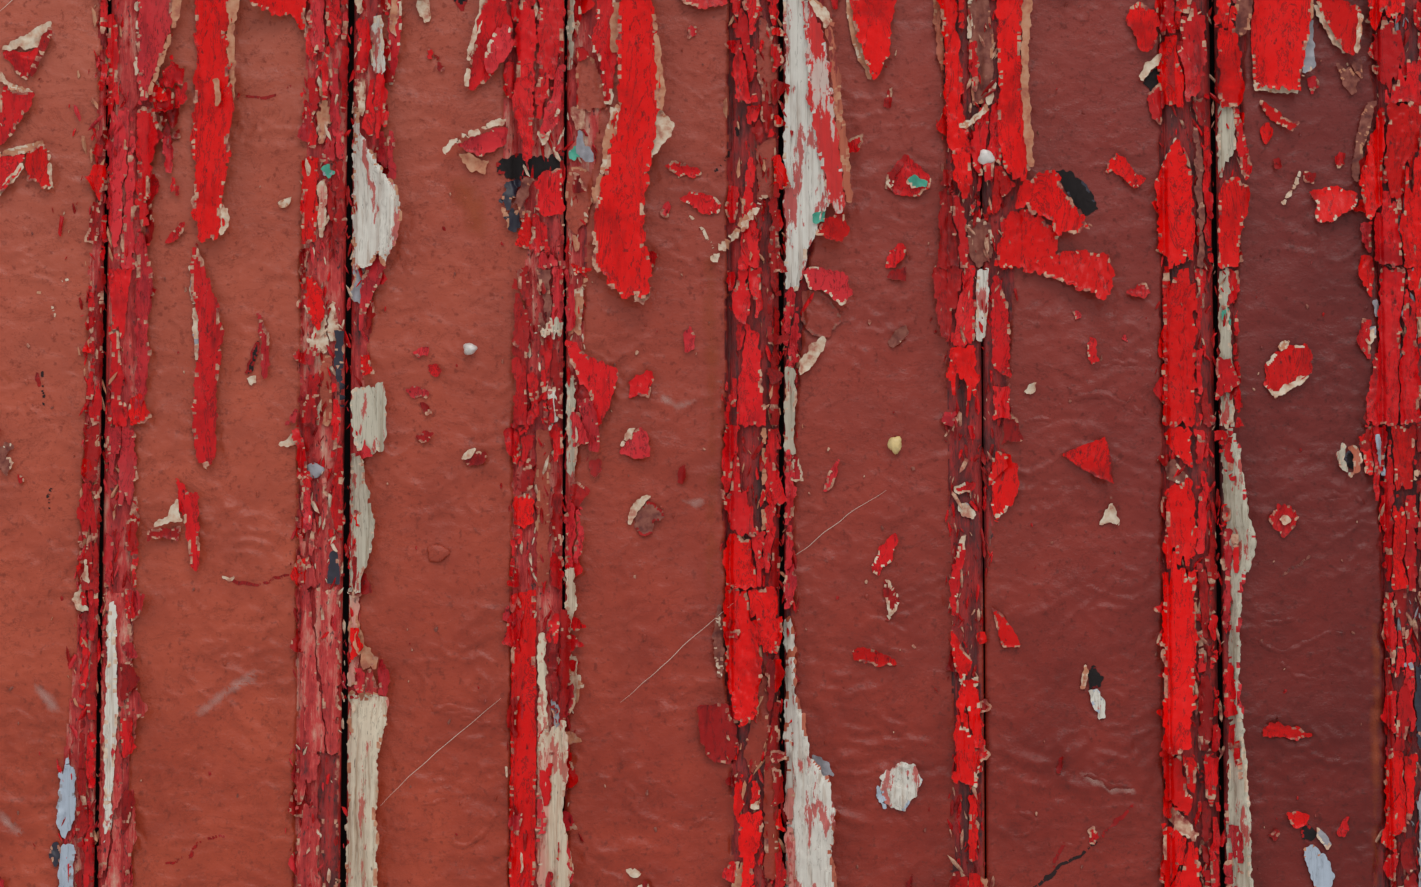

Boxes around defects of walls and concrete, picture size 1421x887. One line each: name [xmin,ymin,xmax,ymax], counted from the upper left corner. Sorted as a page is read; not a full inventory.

peeling [831,0,897,80]
peeling [839,133,863,154]
peeling [406,346,442,443]
peeling [49,0,431,887]
peeling [442,0,853,887]
peeling [885,0,1421,887]
peeling [871,533,899,621]
peeling [852,647,897,667]